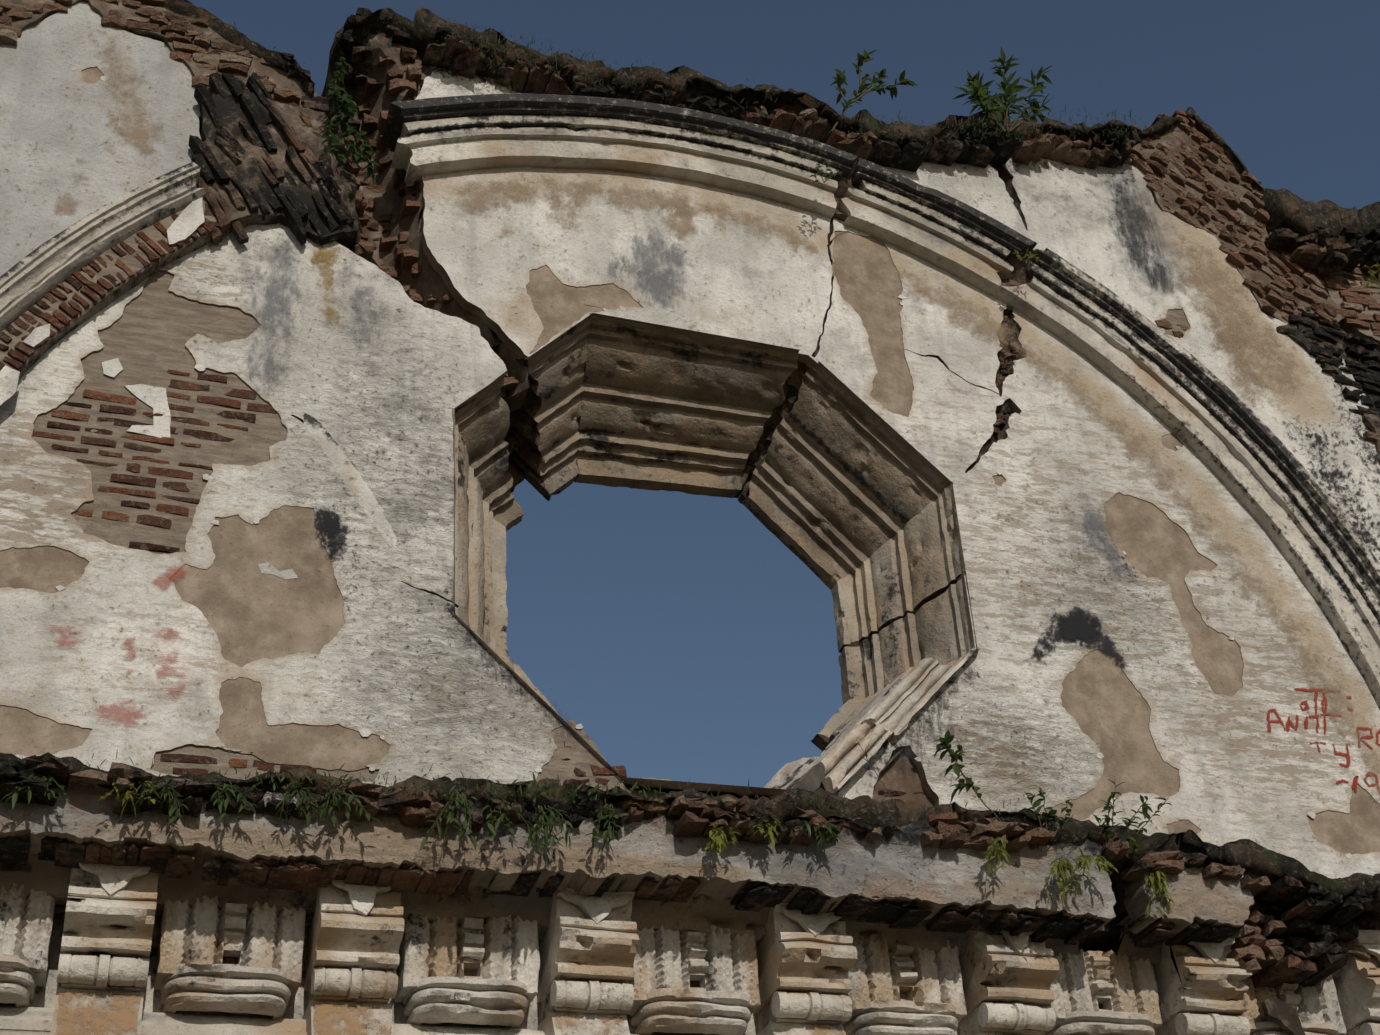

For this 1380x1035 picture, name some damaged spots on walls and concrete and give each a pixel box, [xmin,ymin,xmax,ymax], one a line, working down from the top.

crack [324,8,530,492]
leakage [462,179,813,305]
crack [734,163,858,504]
flaking render [831,231,914,417]
crack [918,164,1034,473]
leakage [1113,184,1294,396]
flaking render [32,271,390,782]
leakage [314,508,346,562]
leakage [1026,607,1127,669]
flaking render [1042,649,1180,820]
flaking render [1104,493,1243,697]
flaking render [1307,784,1380,859]